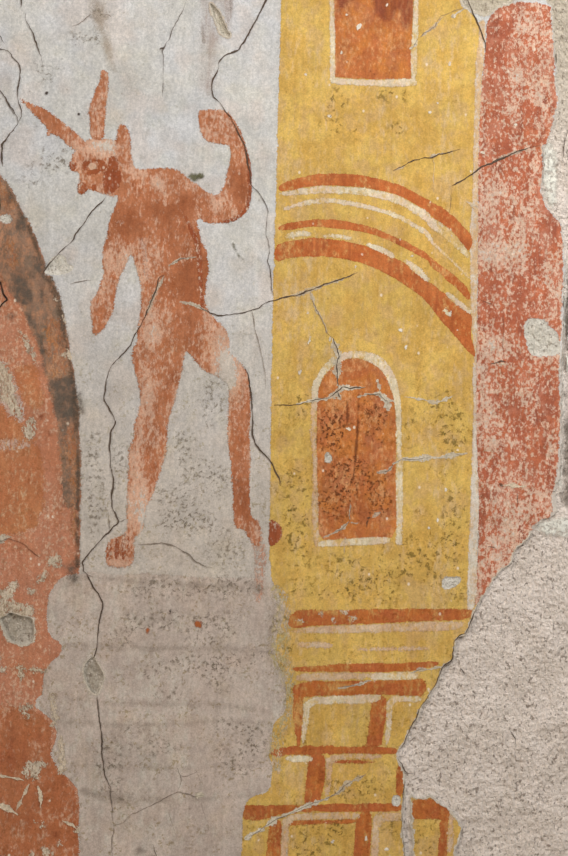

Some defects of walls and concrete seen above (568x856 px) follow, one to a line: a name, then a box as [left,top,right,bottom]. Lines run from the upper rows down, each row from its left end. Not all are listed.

crack [0,36,22,166]
crack [433,131,568,208]
damp [543,143,557,207]
crack [179,0,459,480]
crack [82,257,195,657]
flaking render [392,0,568,856]
damp [537,517,568,537]
spalling [0,553,63,647]
spalling [82,655,105,696]
peeling [21,693,68,781]
crack [97,697,204,846]
crack [244,775,364,840]